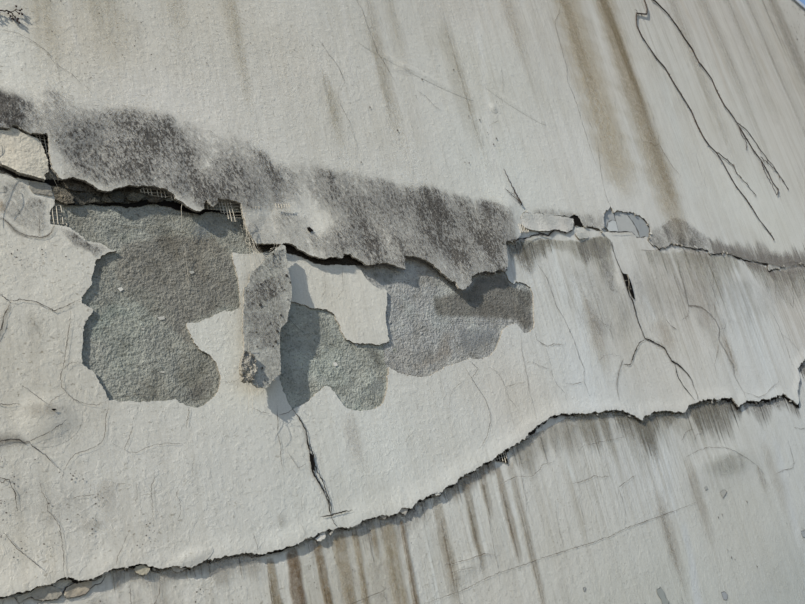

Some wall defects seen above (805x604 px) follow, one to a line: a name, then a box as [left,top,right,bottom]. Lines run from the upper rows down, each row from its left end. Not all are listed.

flaking render [36,135,252,408]
water stain [0,90,613,289]
peeling [604,208,649,238]
crack [507,14,805,307]
water stain [651,218,805,296]
flaking render [267,257,534,411]
crack [0,250,797,604]
water stain [565,411,675,445]
water stain [689,400,770,438]
rust [288,552,304,604]
peeling [657,587,669,604]